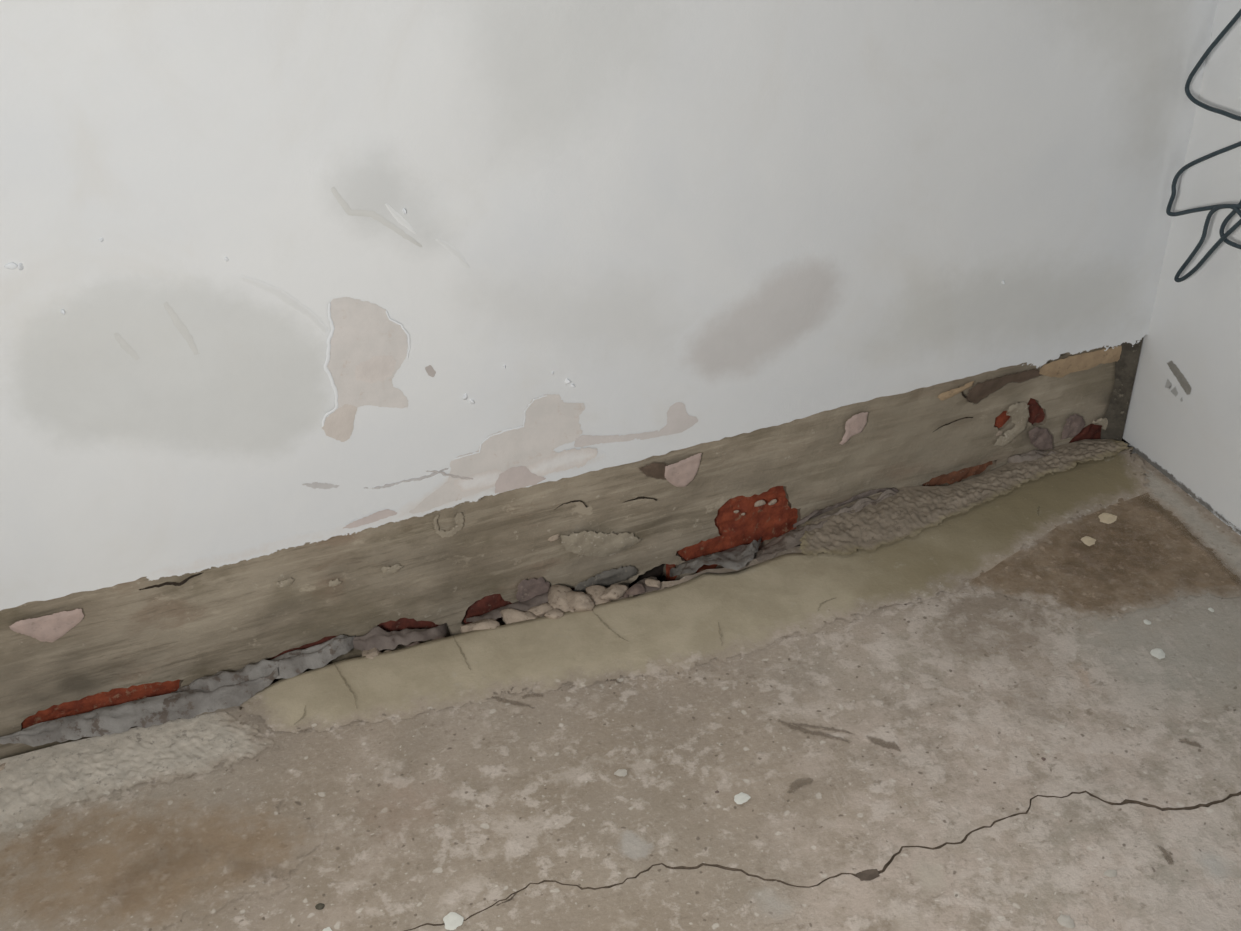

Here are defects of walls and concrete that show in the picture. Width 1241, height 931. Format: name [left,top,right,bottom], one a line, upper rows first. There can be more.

leakage [309,131,852,391]
leakage [0,265,335,466]
peeling [322,297,411,442]
peeling [146,394,698,581]
flaking render [632,486,798,583]
flaking render [922,461,993,486]
flaking render [265,636,337,660]
flaking render [377,618,439,632]
flaking render [462,594,524,624]
flaking render [21,679,180,729]
crack [404,790,1241,931]